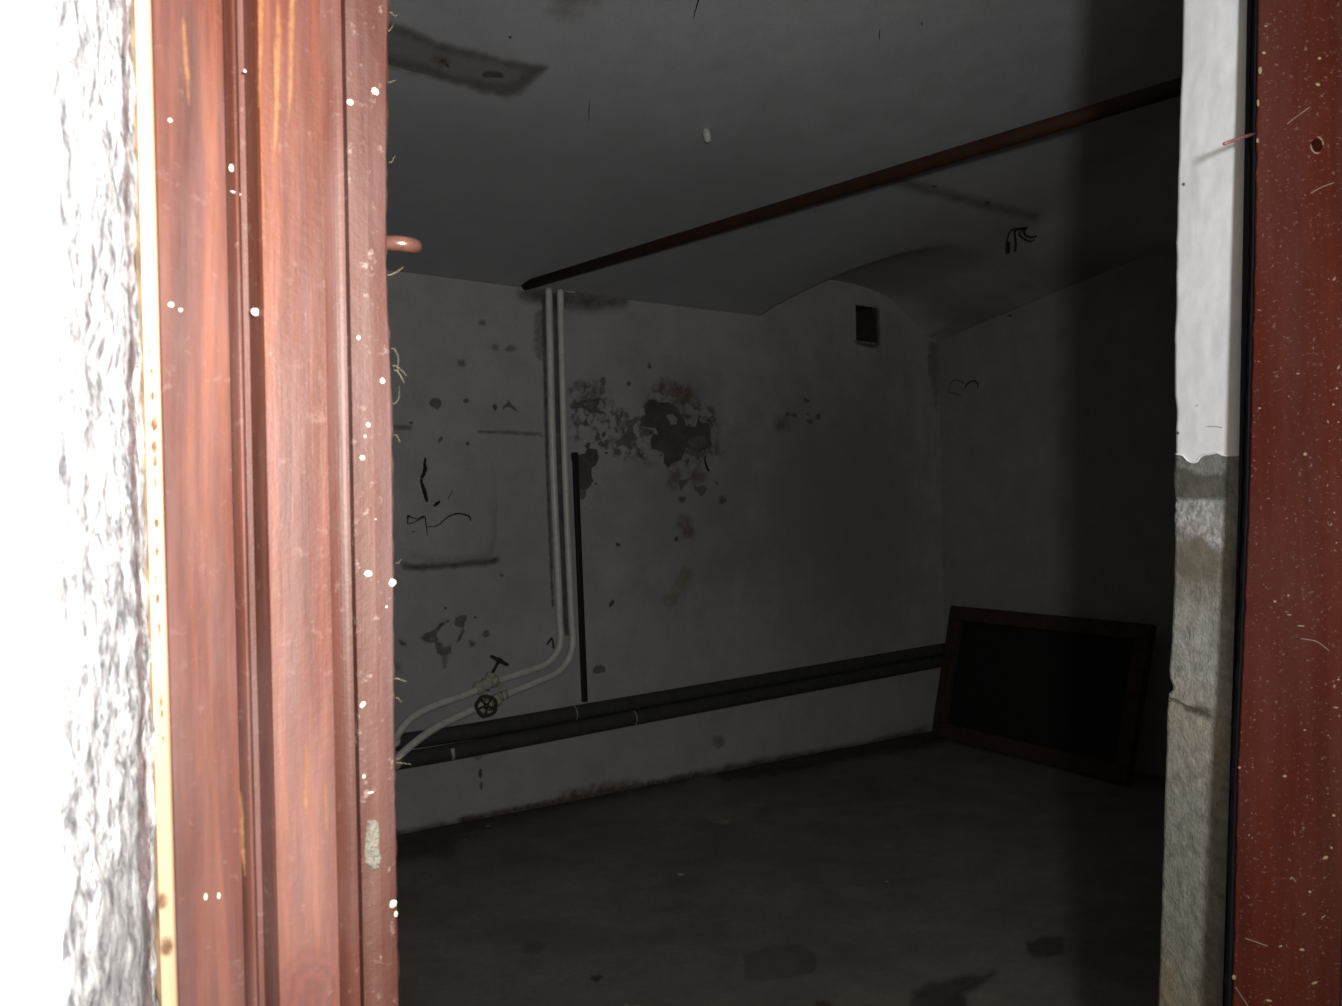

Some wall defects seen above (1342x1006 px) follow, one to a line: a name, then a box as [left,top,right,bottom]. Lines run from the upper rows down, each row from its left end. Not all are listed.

leakage [387,27,542,94]
flaking render [571,399,711,499]
flaking render [422,607,488,655]